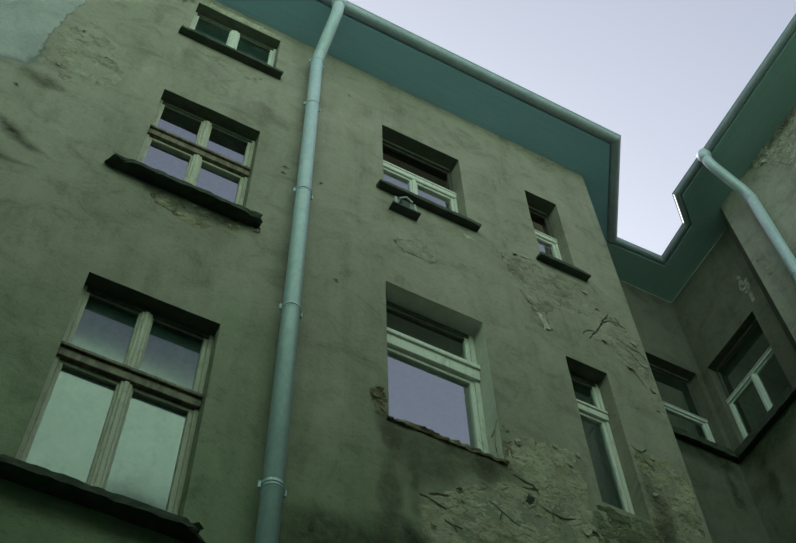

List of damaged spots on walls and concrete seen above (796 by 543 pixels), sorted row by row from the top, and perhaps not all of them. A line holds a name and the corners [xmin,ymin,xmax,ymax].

flaking render [752,106,796,170]
flaking render [498,249,667,418]
crack [583,314,647,389]
flaking render [370,384,388,418]
flaking render [417,425,707,543]